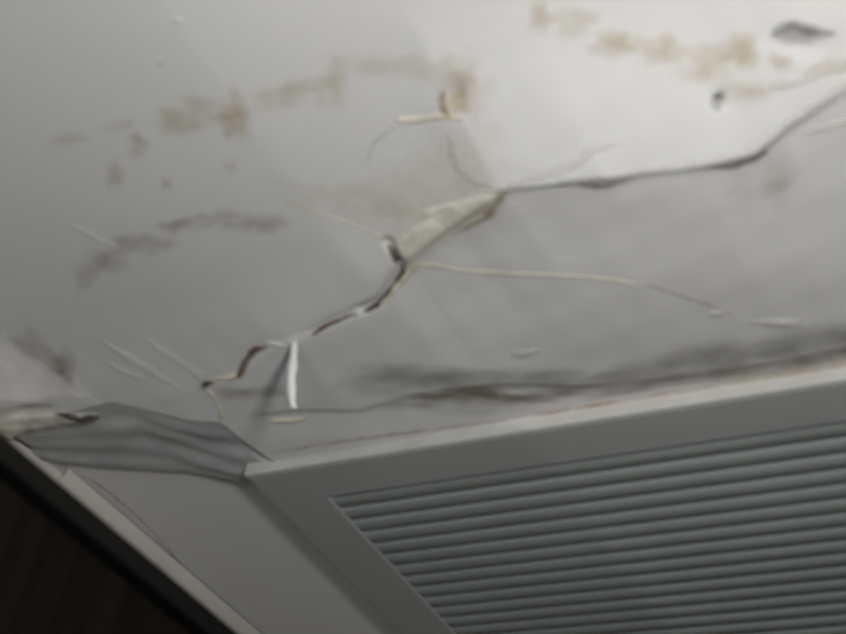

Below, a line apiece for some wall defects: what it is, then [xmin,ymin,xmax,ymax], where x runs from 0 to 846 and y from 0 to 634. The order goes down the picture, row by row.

crack [314,245,634,333]
peeling [0,336,305,482]